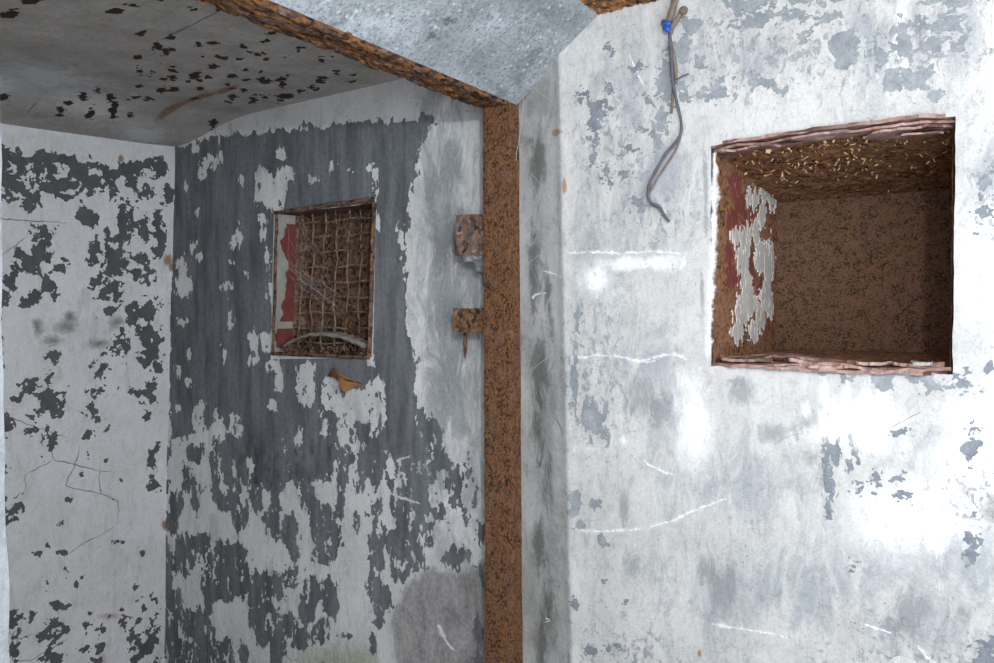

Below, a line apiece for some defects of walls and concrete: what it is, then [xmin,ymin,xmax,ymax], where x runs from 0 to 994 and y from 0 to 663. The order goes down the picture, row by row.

crack [985,0,994,48]
spalling [55,31,358,127]
peeling [628,15,788,153]
peeling [575,81,640,186]
peeling [969,172,994,238]
peeling [722,164,777,347]
peeling [1,111,486,663]
peeling [565,303,611,448]
flaking render [812,364,983,399]
peeling [821,434,913,520]
peeling [960,419,991,478]
peeling [954,511,984,568]